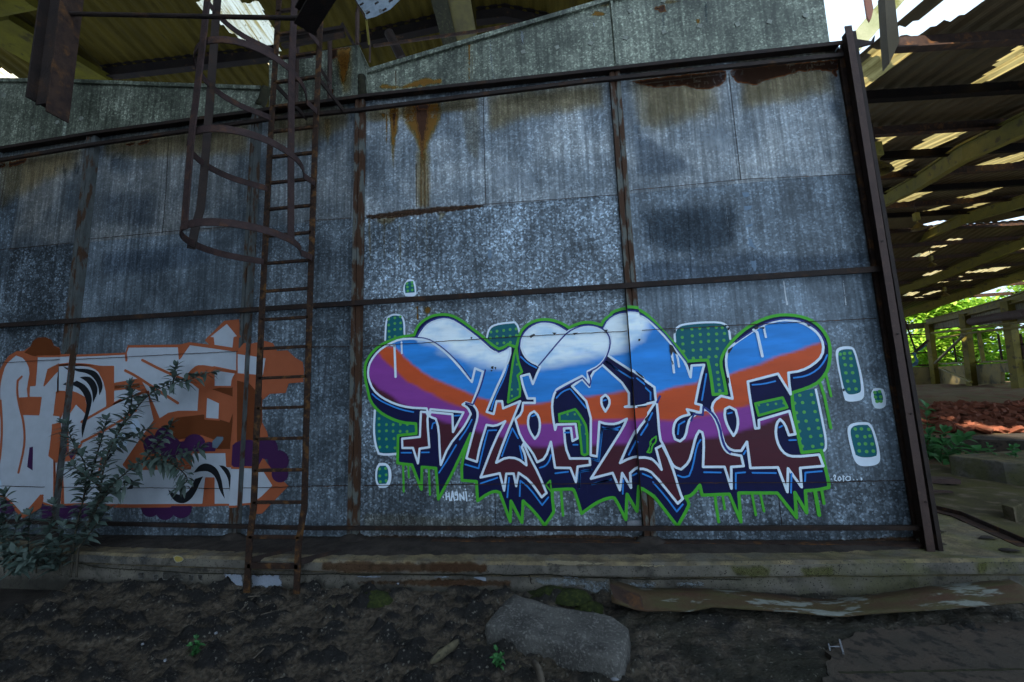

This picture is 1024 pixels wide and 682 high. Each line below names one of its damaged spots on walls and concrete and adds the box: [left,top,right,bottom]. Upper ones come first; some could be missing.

rust [633,59,839,90]
rust [366,103,484,219]